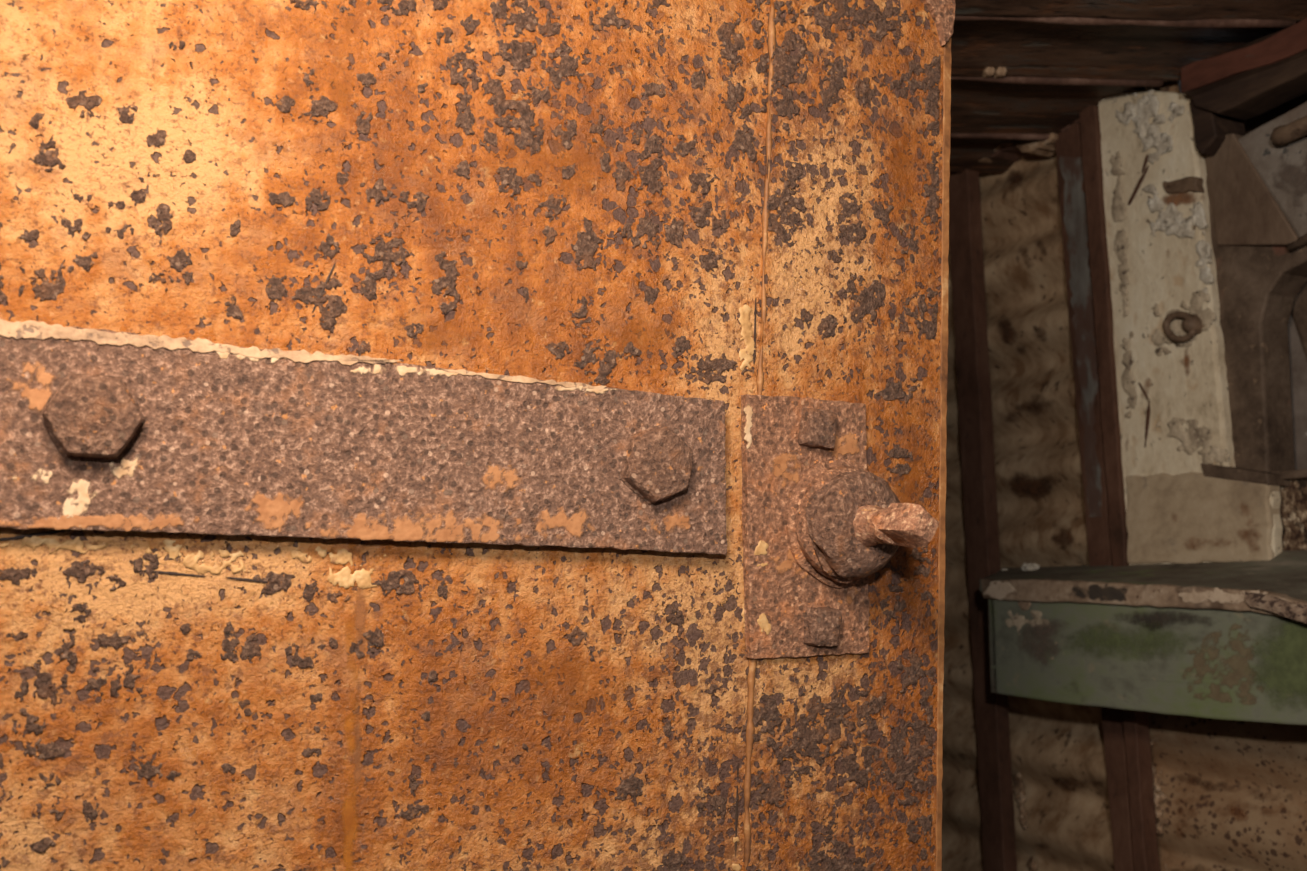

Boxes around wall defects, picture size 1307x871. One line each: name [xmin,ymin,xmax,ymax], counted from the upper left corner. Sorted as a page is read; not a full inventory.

corrosion [28,113,66,173]
corrosion [66,85,102,118]
corrosion [0,171,193,304]
corrosion [265,172,430,333]
corrosion [436,0,730,279]
corrosion [716,0,941,345]
corrosion [671,334,754,385]
corrosion [0,564,38,587]
corrosion [62,553,159,591]
corrosion [253,571,385,671]
corrosion [12,603,149,789]
corrosion [696,653,934,860]